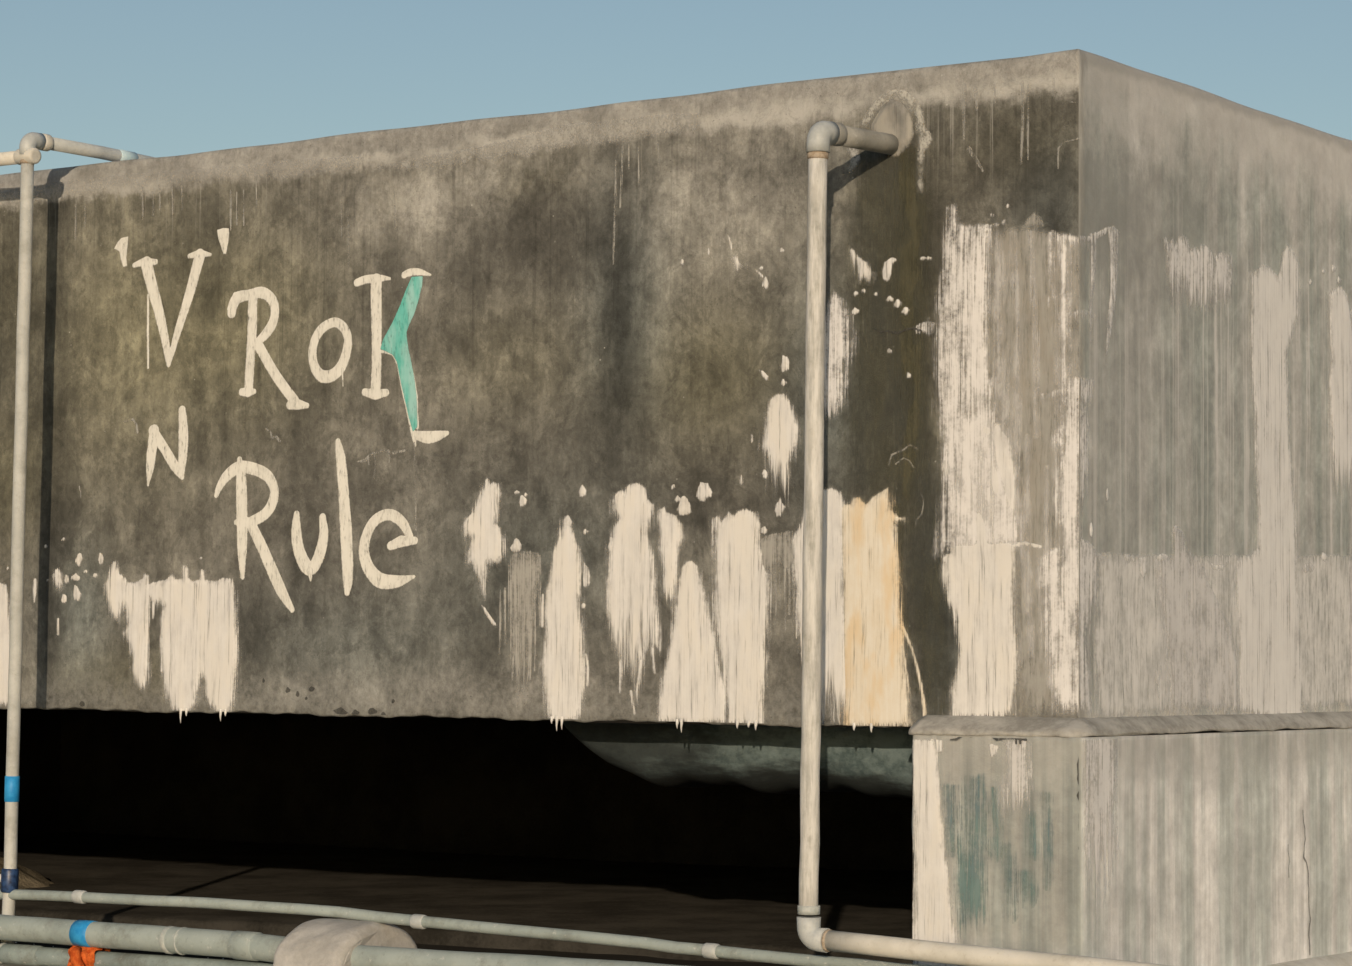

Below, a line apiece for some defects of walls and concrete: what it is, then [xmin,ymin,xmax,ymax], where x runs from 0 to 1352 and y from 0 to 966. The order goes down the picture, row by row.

damp [1021,115,1029,158]
damp [613,144,640,264]